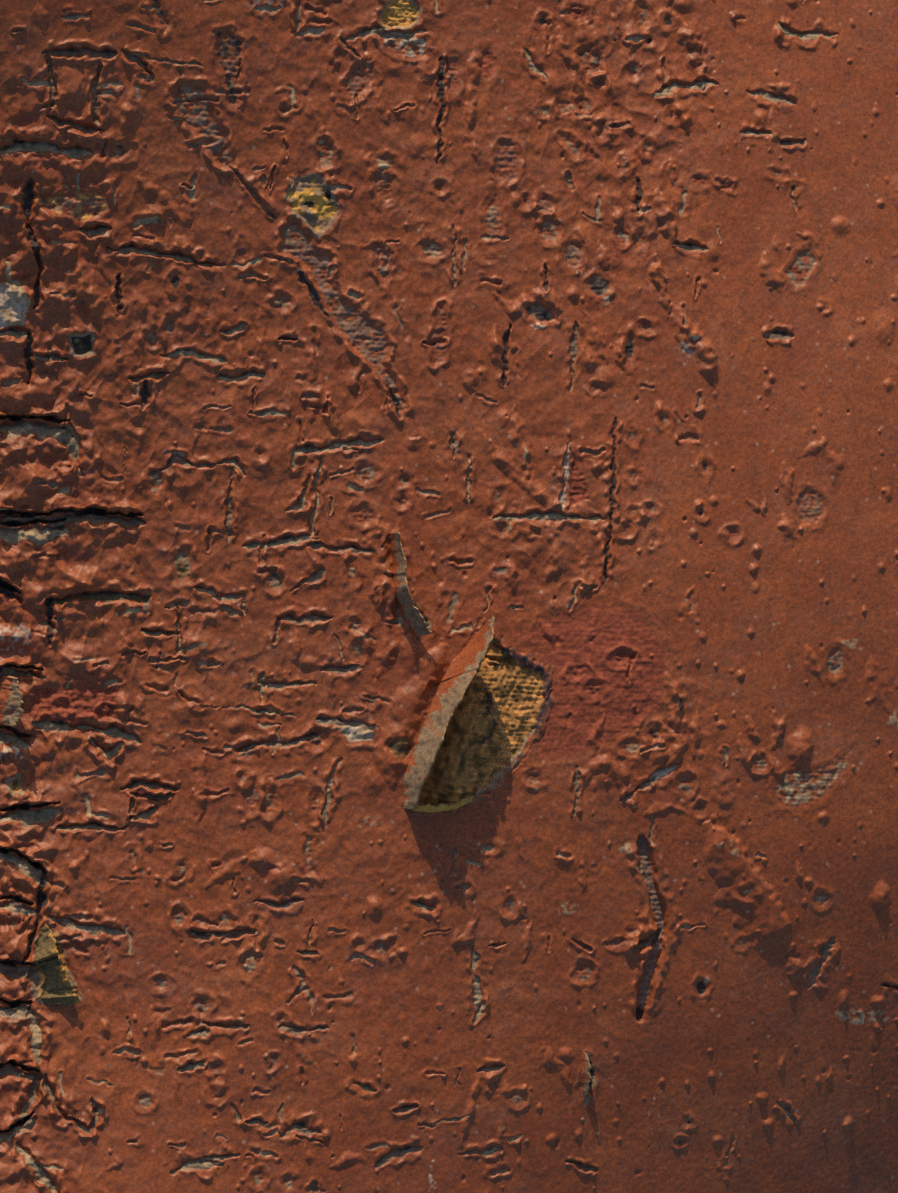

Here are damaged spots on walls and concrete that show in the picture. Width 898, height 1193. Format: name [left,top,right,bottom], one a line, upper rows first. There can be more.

peeling [229,229,257,280]
peeling [273,131,416,427]
peeling [363,235,452,293]
peeling [0,675,131,728]
peeling [300,589,692,817]
peeling [0,768,30,804]
peeling [28,882,91,1013]
crack [620,763,683,1023]